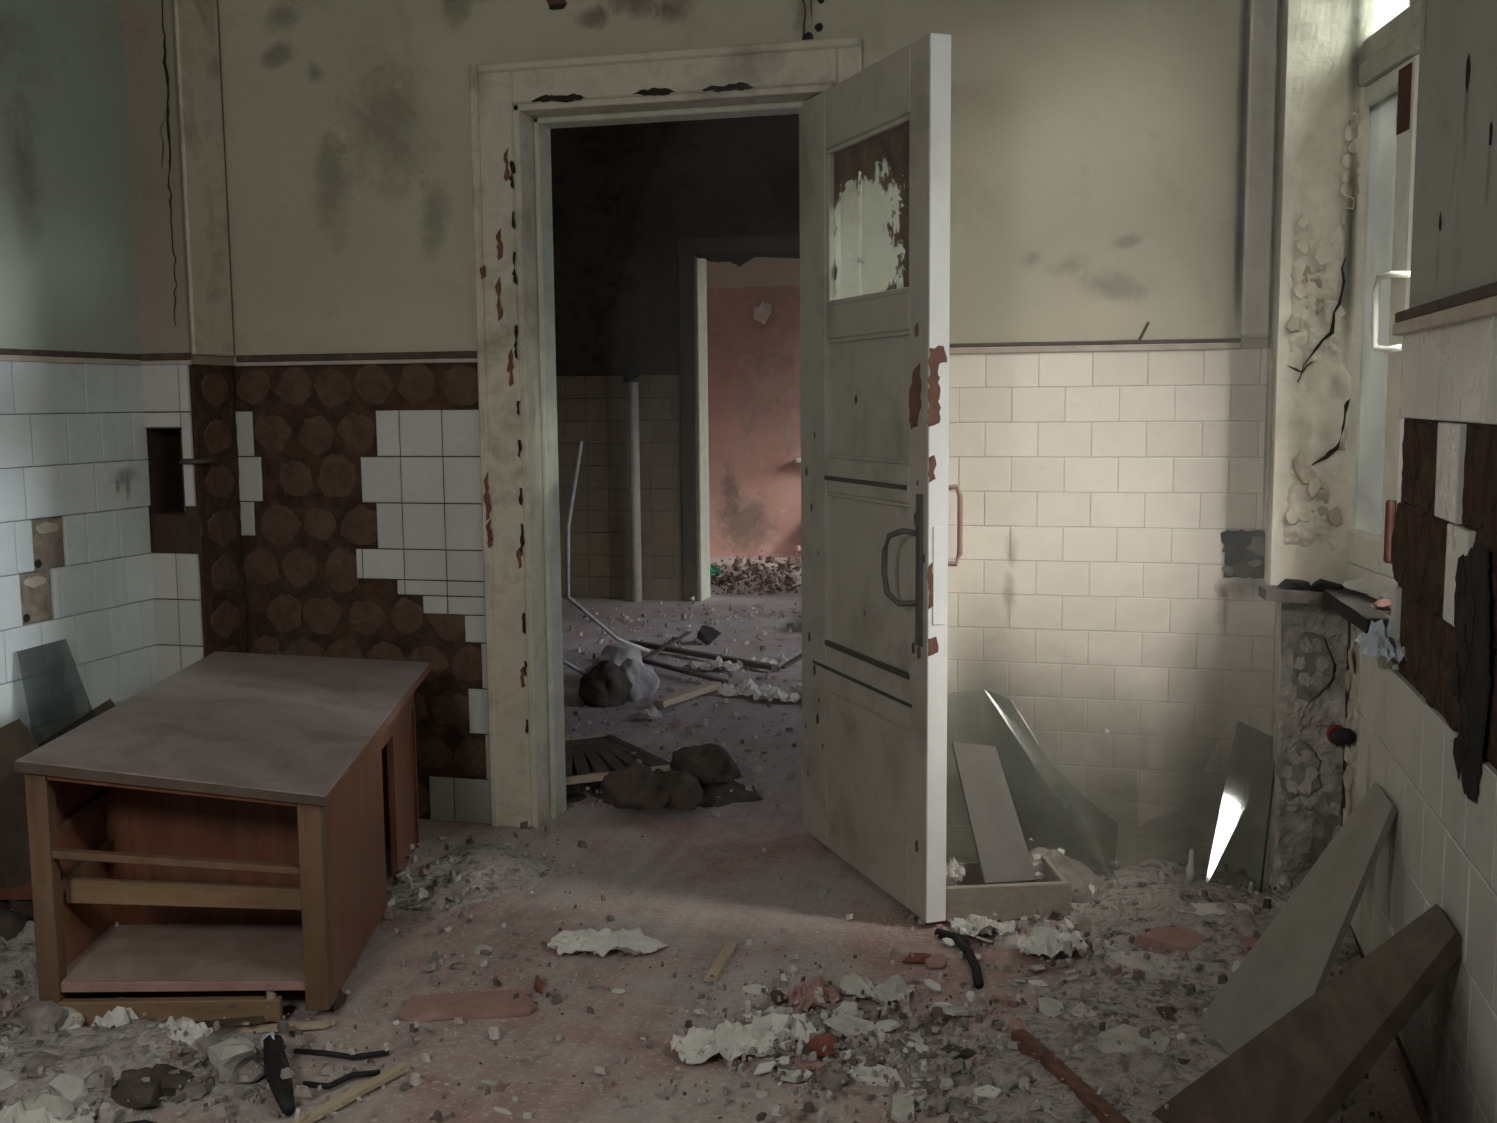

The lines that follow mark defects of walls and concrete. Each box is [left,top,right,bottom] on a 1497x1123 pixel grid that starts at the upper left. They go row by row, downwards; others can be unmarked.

peeling [546,0,567,10]
crack [159,0,177,326]
peeling [480,228,503,321]
peeling [834,122,910,291]
peeling [1285,107,1360,383]
peeling [19,517,65,623]
peeling [153,363,493,819]
peeling [1275,418,1497,864]